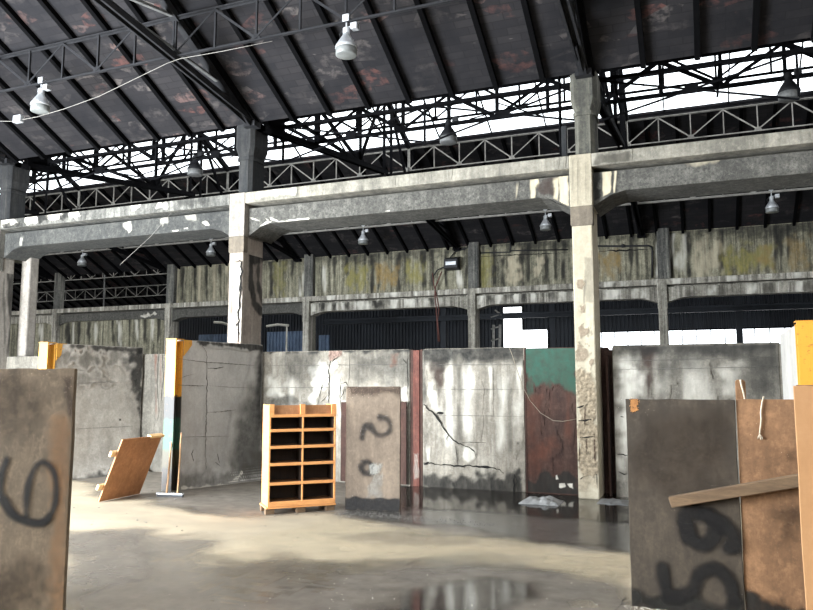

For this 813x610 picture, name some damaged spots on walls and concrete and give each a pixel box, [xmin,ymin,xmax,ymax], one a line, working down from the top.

crack [235,260,243,341]
leakage [247,254,273,318]
leakage [311,254,468,312]
leakage [477,249,568,305]
leakage [582,241,649,307]
leakage [668,235,813,296]
crack [182,347,254,464]
crack [318,350,347,406]
crack [423,404,517,492]
leakage [423,352,579,494]
corrosion [526,371,576,480]
spalling [525,323,599,492]